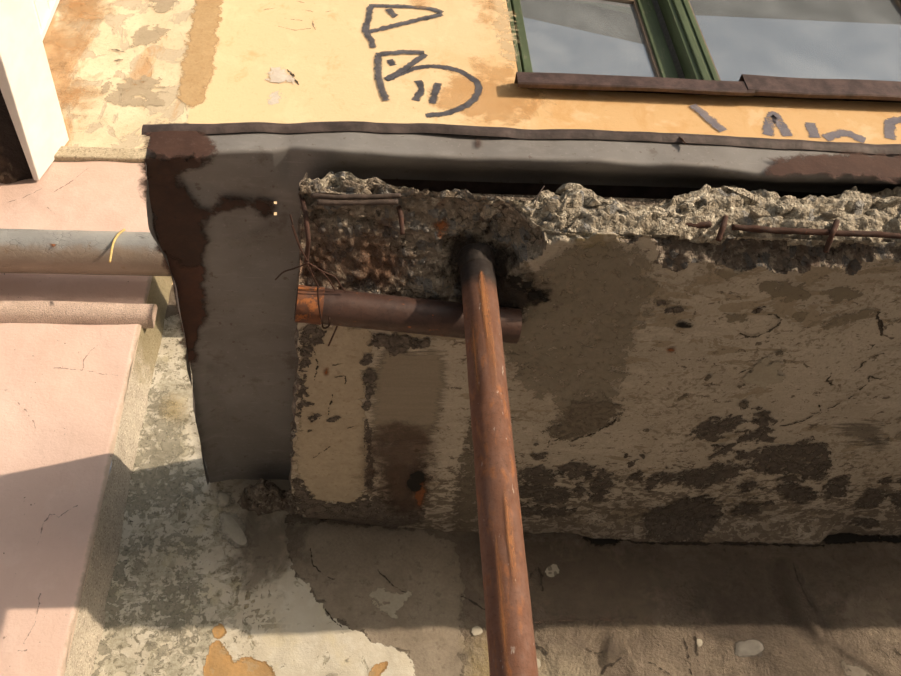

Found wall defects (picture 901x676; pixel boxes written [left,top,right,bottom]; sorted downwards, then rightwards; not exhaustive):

peeling [100,75,168,109]
rust [765,151,901,184]
rust [139,123,275,372]
rust [480,271,496,366]
spalling [294,171,901,443]
crack [739,306,781,338]
crack [781,311,884,426]
peeling [515,401,901,546]
peeling [203,623,276,676]
peeling [237,478,483,676]
rust [496,543,506,654]
rust [505,495,514,572]